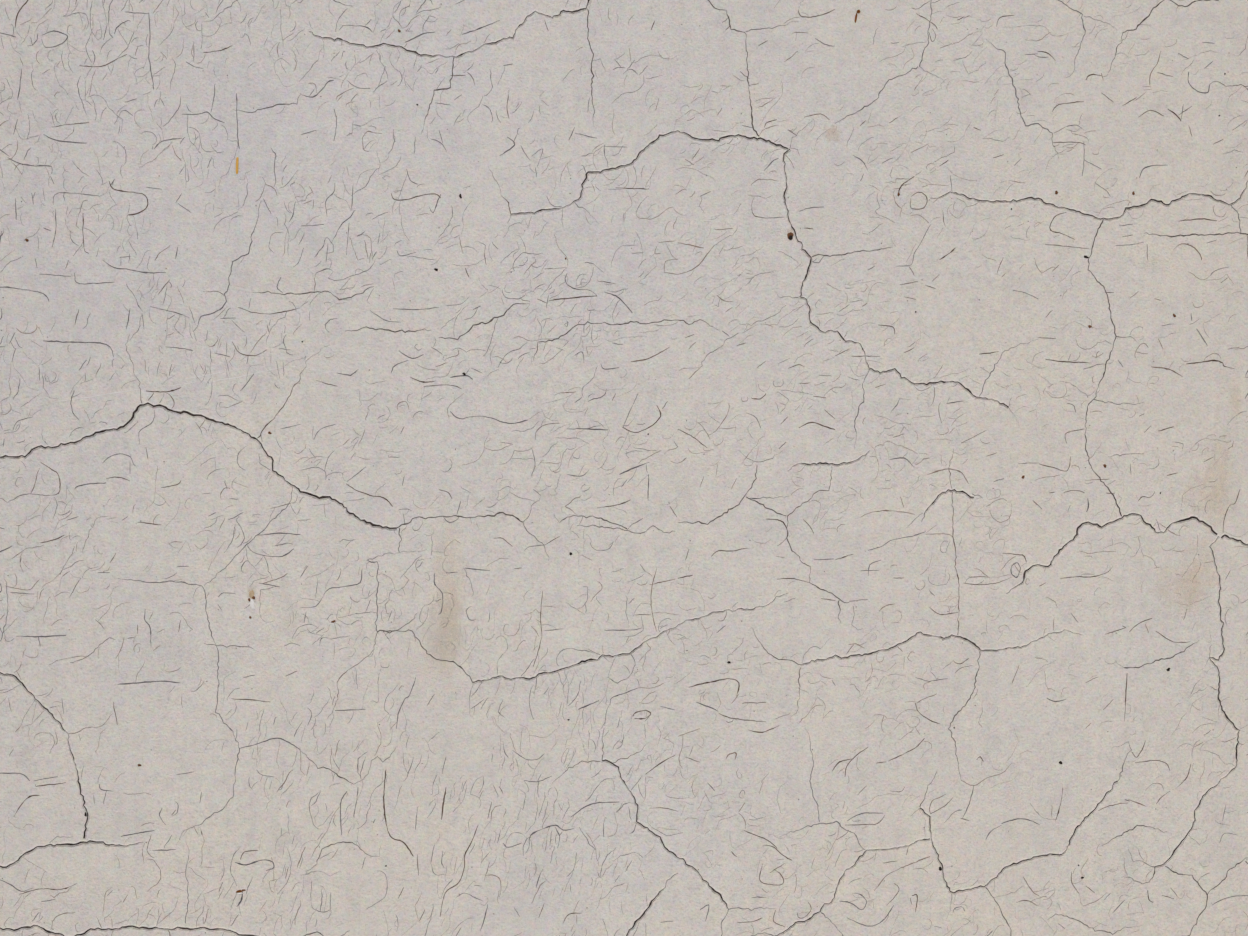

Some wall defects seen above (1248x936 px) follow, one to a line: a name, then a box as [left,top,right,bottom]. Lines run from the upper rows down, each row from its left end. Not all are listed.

crack [997,15,1055,60]
crack [454,64,522,124]
crack [602,49,661,110]
crack [359,392,422,433]
crack [662,402,736,477]
crack [1167,394,1248,476]
crack [140,466,190,526]
crack [571,568,624,628]
crack [117,662,181,693]
crack [986,788,1063,839]
crack [1097,825,1167,856]
crack [1071,861,1117,906]